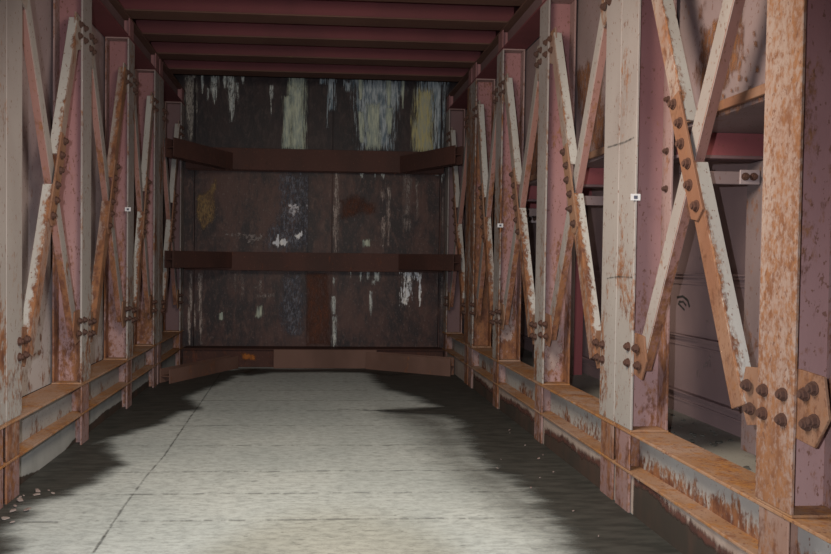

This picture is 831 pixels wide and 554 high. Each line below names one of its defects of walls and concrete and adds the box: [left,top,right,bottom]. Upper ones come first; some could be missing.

rust [694,20,718,94]
rust [722,20,757,98]
leakage [185,75,244,140]
leakage [282,78,307,149]
leakage [320,78,449,152]
leakage [399,272,422,307]